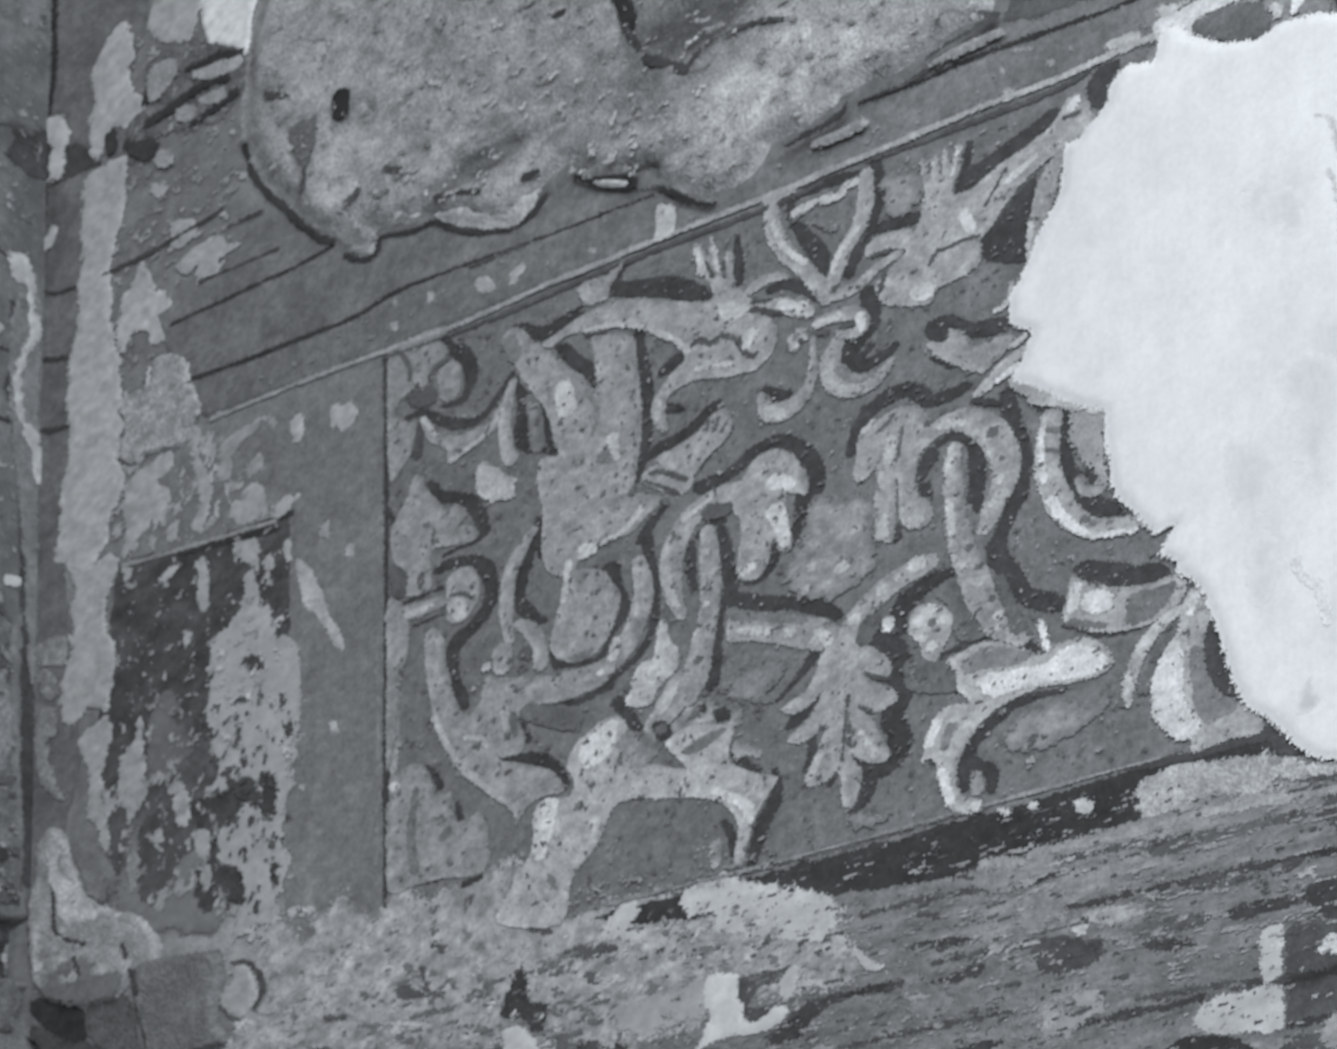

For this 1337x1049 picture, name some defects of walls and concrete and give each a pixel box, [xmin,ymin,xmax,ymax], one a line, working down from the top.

peeling [877,165,925,218]
crack [1313,112,1337,230]
flaking render [999,8,1337,764]
peeling [329,399,358,433]
peeling [0,0,308,1020]
peeling [845,807,893,832]
peeling [597,899,646,943]
peeling [679,869,841,942]
peeling [855,948,885,971]
peeling [611,964,802,1049]
peeling [501,1023,540,1049]